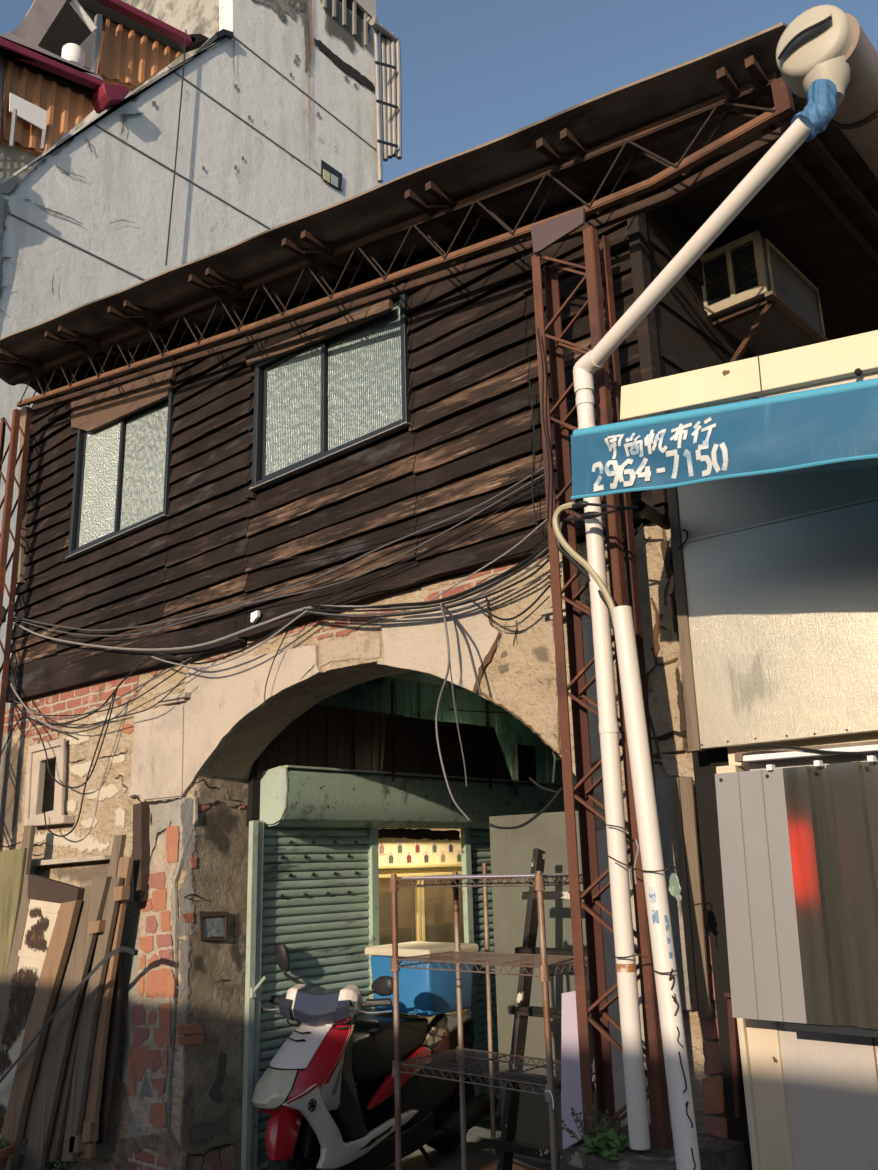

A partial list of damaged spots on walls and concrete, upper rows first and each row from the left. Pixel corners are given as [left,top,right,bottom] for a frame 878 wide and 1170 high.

peeling [252,0,305,22]
peeling [321,0,371,52]
crack [646,581,678,692]
crack [473,598,555,752]
flaking render [3,667,158,745]
peeling [68,761,93,778]
peeling [109,754,125,764]
crack [651,730,687,765]
peeling [34,783,125,853]
leakage [204,808,237,852]
leakage [231,915,241,970]
flaking render [126,798,209,1170]